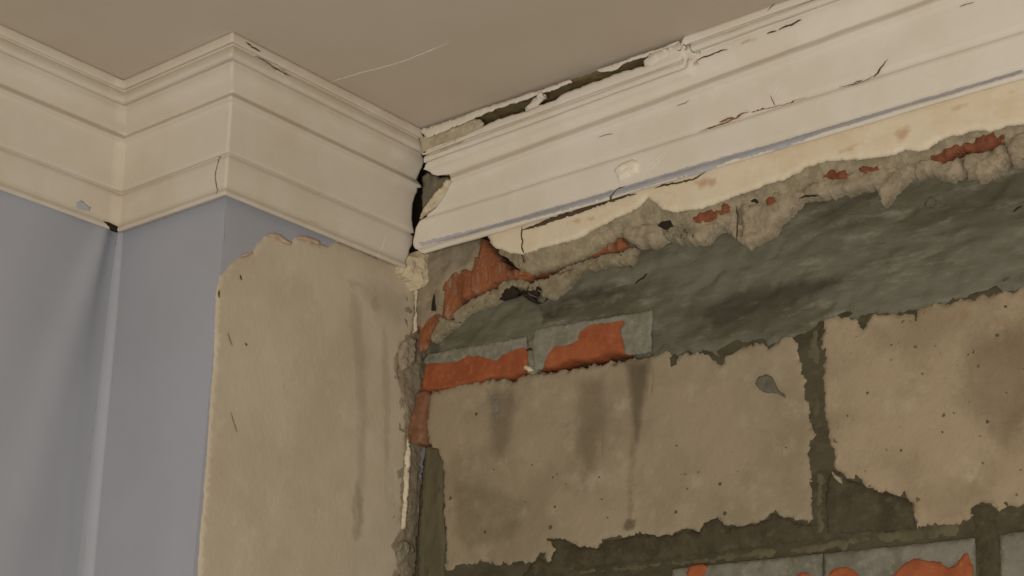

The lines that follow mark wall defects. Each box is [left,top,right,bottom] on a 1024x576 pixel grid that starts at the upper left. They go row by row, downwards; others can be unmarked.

peeling [475,42,697,126]
crack [842,59,888,87]
crack [702,96,803,131]
crack [419,179,451,220]
peeling [198,125,1024,576]